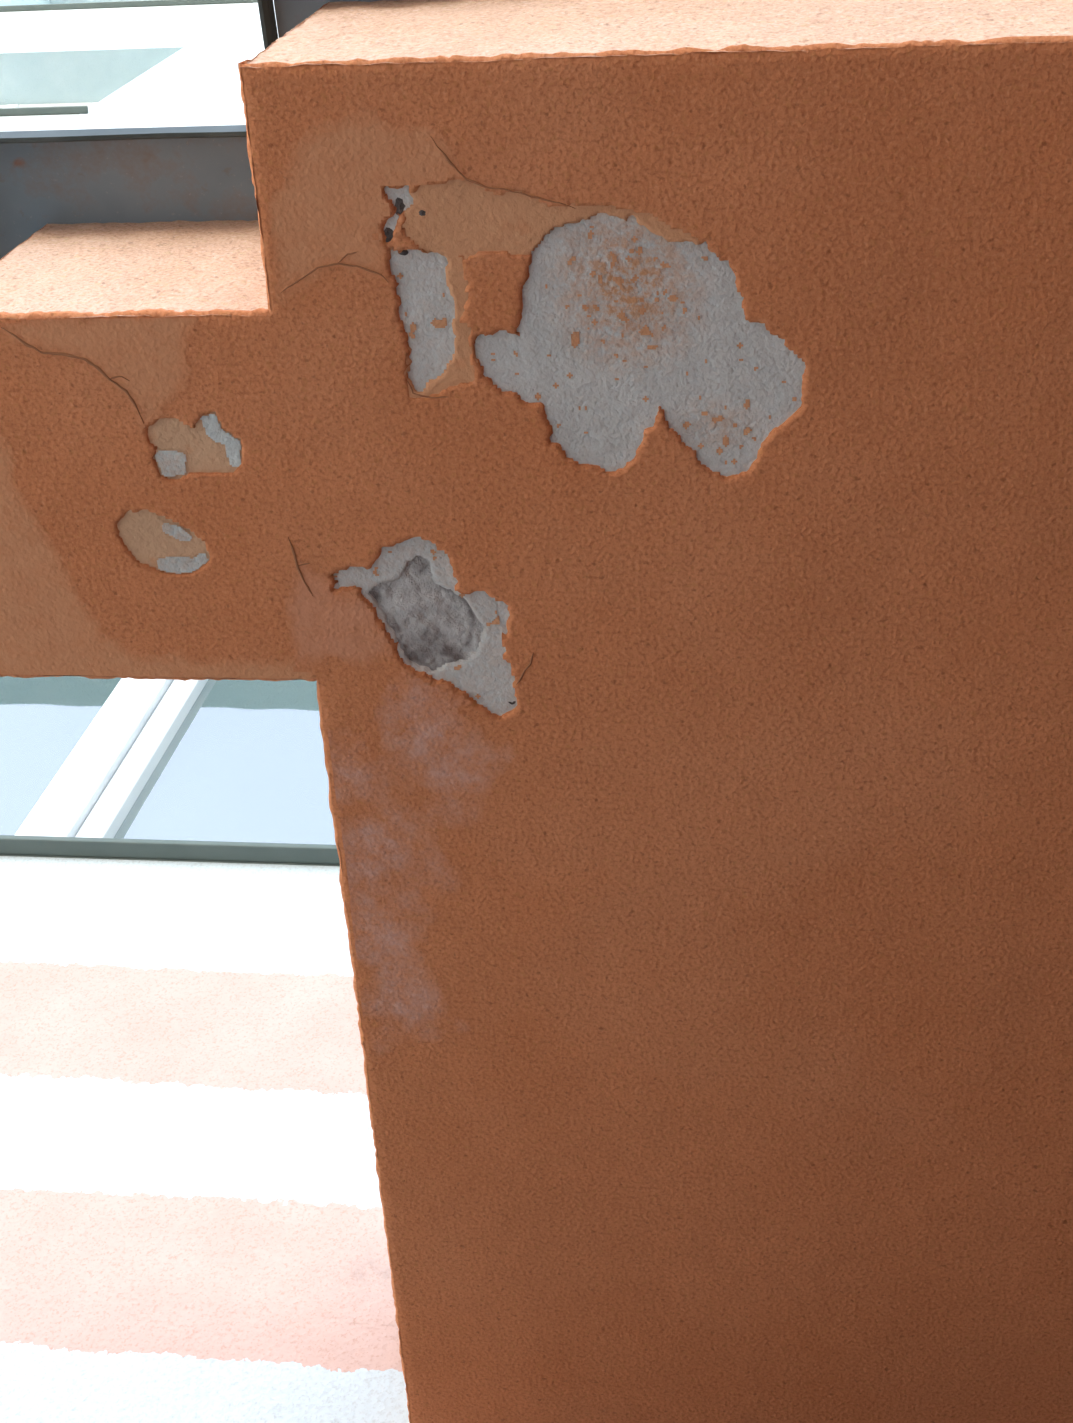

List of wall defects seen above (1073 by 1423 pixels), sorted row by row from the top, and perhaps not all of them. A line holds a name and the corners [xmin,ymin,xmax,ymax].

crack [280,252,388,294]
peeling [267,106,806,477]
crack [0,327,144,423]
peeling [0,317,242,479]
peeling [0,409,517,716]